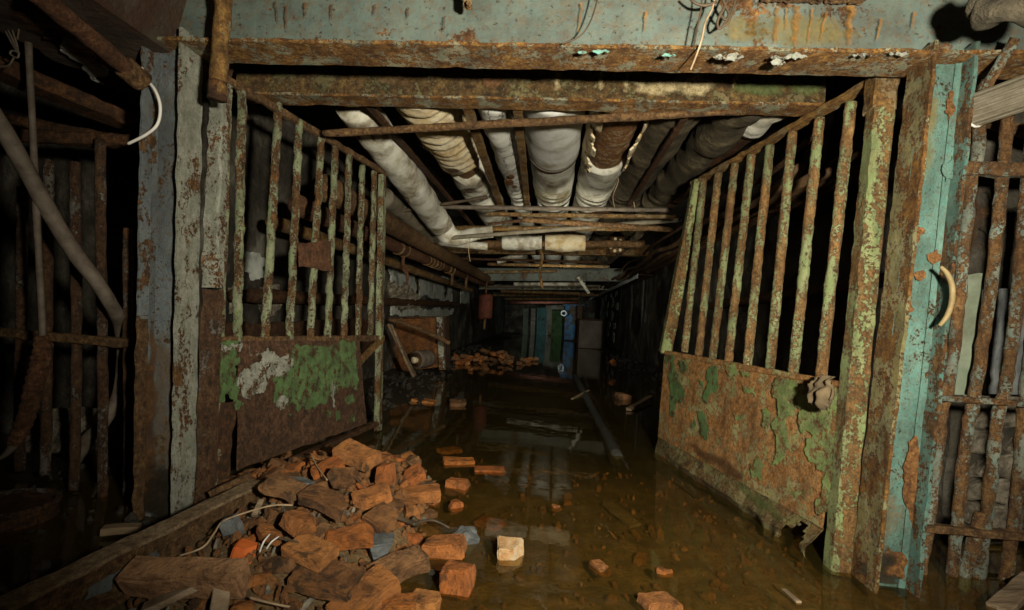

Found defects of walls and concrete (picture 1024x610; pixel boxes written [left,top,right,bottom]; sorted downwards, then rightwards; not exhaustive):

corrosion [769,6,855,42]
corrosion [482,69,511,88]
corrosion [930,90,956,124]
corrosion [913,249,942,281]
peeling [221,339,359,423]
peeling [665,354,688,417]
peeling [691,363,756,441]
peeling [750,376,838,516]
corrosion [902,436,919,523]
corrosion [879,548,908,584]